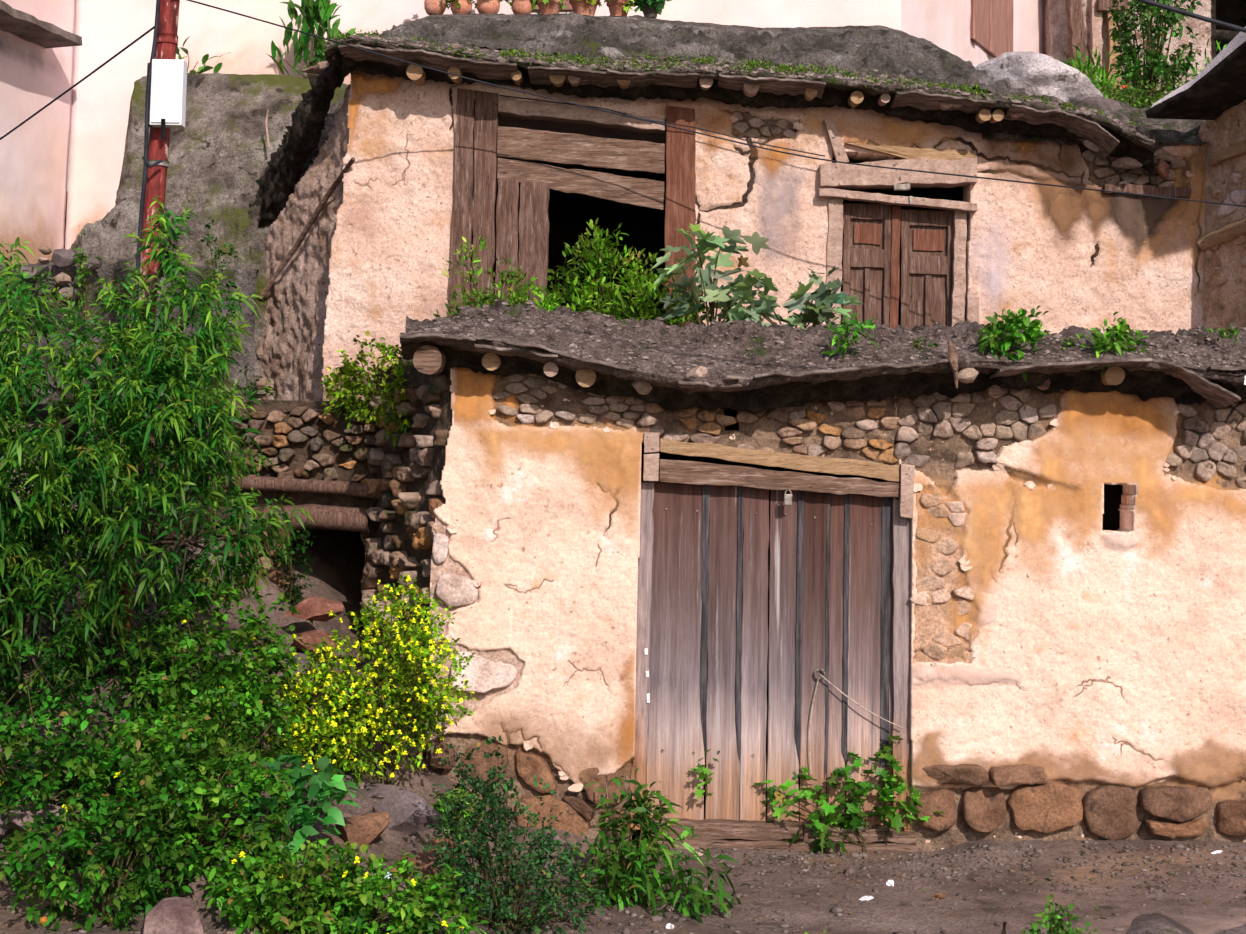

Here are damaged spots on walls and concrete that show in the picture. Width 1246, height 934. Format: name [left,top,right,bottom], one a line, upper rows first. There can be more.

crack [695,136,758,238]
flaking render [724,110,803,147]
water stain [989,139,1206,253]
flaking render [1077,143,1193,188]
crack [596,481,619,567]
flaking render [488,372,1064,666]
water stain [1008,390,1246,551]
flaking render [1163,399,1246,490]
flaking render [426,514,634,845]
crack [1076,676,1128,702]